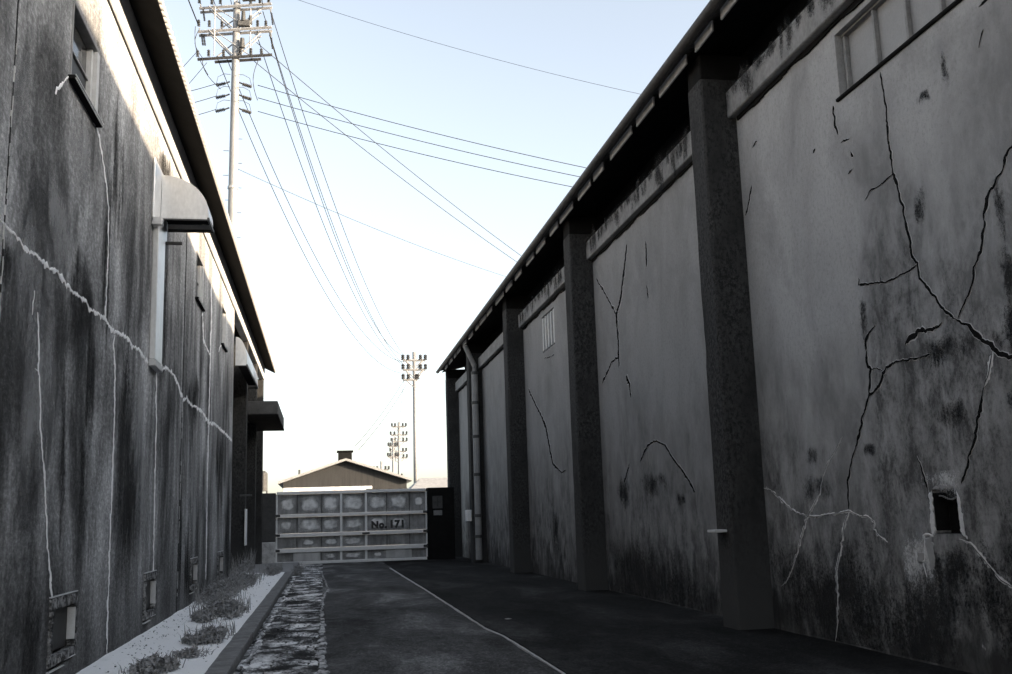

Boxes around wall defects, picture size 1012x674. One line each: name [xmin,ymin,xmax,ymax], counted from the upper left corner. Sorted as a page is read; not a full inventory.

crack [978,0,988,48]
damp [0,224,66,533]
damp [50,106,124,428]
crack [0,123,232,652]
damp [114,361,147,576]
damp [178,468,196,592]
damp [188,371,199,425]
crack [597,242,649,398]
crack [624,440,696,493]
crack [764,71,1012,641]
damp [769,501,1012,664]
damp [993,253,1012,353]